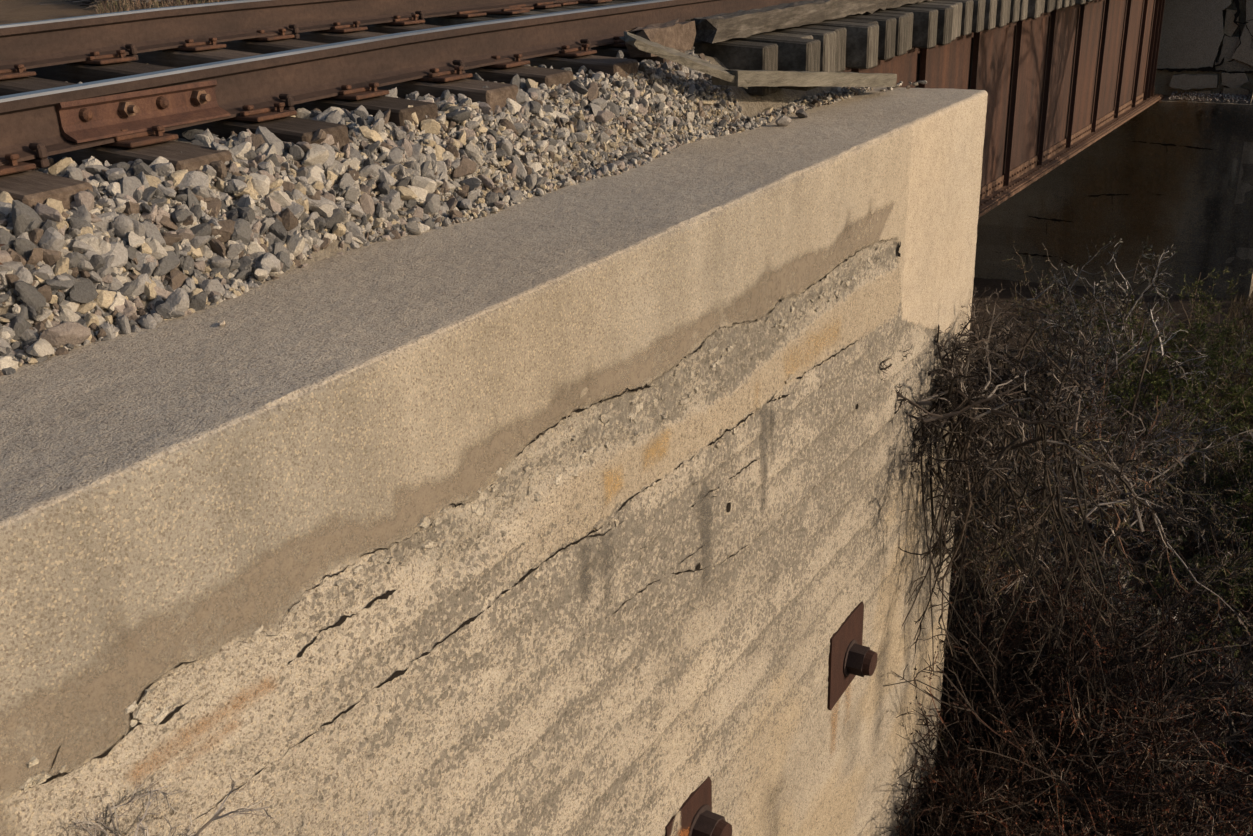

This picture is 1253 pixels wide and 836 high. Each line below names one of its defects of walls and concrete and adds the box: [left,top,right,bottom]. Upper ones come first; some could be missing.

crack [1156,0,1253,74]
spalling [765,245,884,335]
spalling [554,370,699,486]
spalling [416,508,451,550]
damp [0,204,894,790]
crack [178,235,901,833]
spalling [122,687,172,738]
spalling [18,756,69,791]